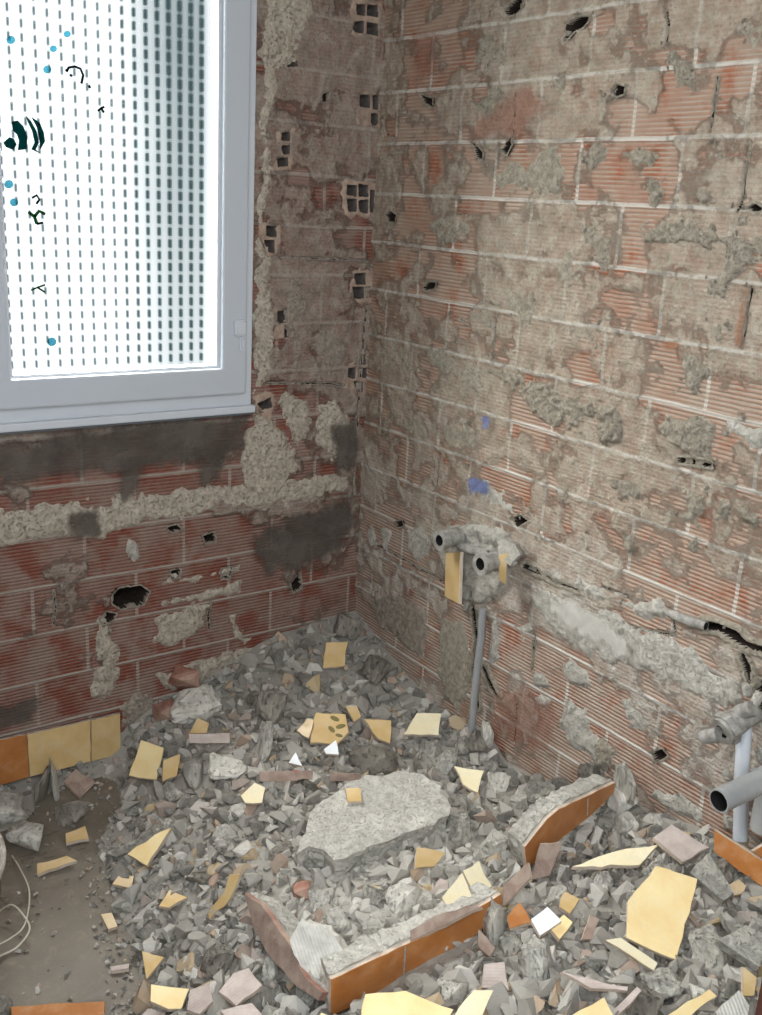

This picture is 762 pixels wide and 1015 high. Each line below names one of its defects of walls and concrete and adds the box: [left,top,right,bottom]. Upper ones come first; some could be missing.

spalling [350,0,383,38]
spalling [504,0,524,19]
spalling [564,10,594,43]
crack [731,141,752,213]
spalling [341,179,397,226]
crack [741,282,755,348]
damp [0,417,248,501]
damp [332,422,358,469]
crack [519,559,631,599]
spalling [99,582,156,634]
crack [529,630,537,670]
crack [635,614,762,689]